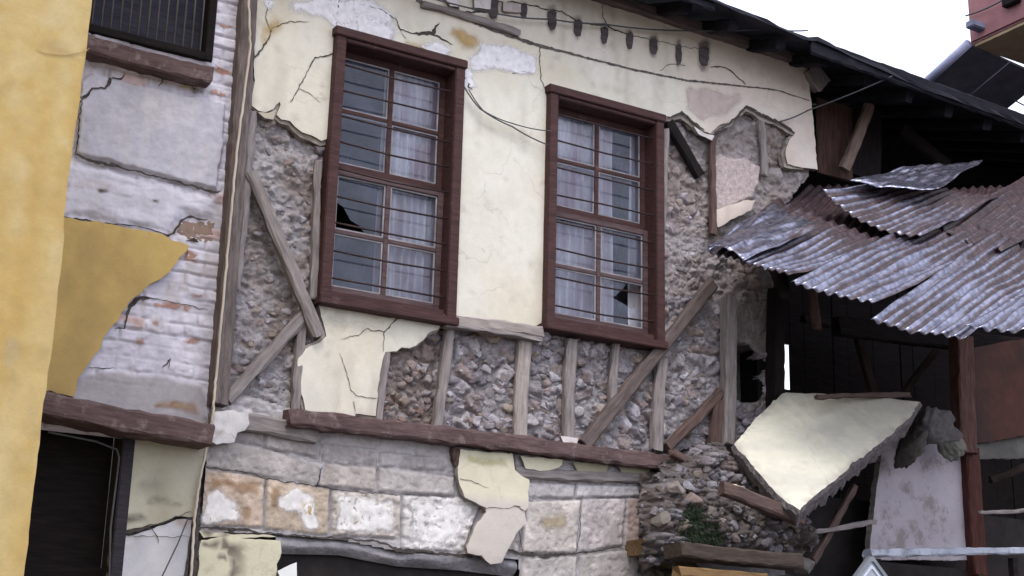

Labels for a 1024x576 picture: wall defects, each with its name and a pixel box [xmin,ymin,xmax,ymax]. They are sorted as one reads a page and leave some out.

crack [336,1,810,144]
crack [74,73,220,194]
flaking render [46,217,215,397]
crack [118,296,207,329]
spalling [593,114,922,528]
spalling [383,330,517,434]
leakage [202,489,240,525]
leakage [278,488,319,530]
crack [126,466,480,576]
leakage [336,495,394,533]
leakage [410,502,472,545]
flaking render [454,449,651,564]